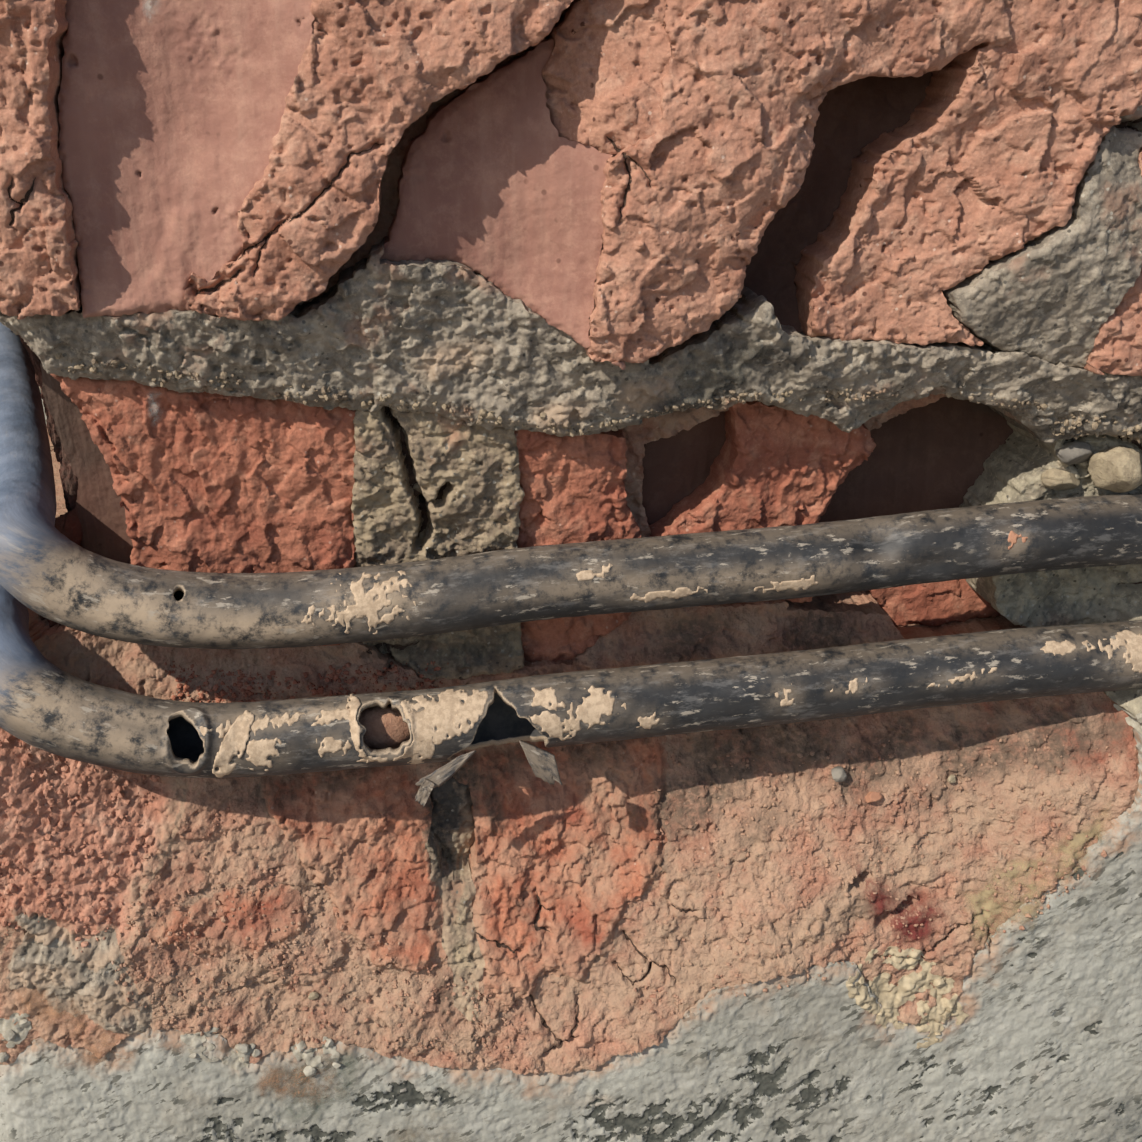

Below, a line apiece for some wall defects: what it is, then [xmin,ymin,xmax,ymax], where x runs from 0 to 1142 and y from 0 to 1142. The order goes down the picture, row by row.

crack [196,143,381,295]
crack [384,405,447,537]
crack [534,891,550,932]
crack [475,932,517,953]
crack [615,930,676,985]
spalling [0,1013,32,1063]
spalling [289,1036,342,1077]
crack [529,994,579,1053]
spalling [846,946,969,1089]
peeling [352,1080,456,1113]
peeling [921,1093,961,1137]
peeling [983,1085,1007,1116]